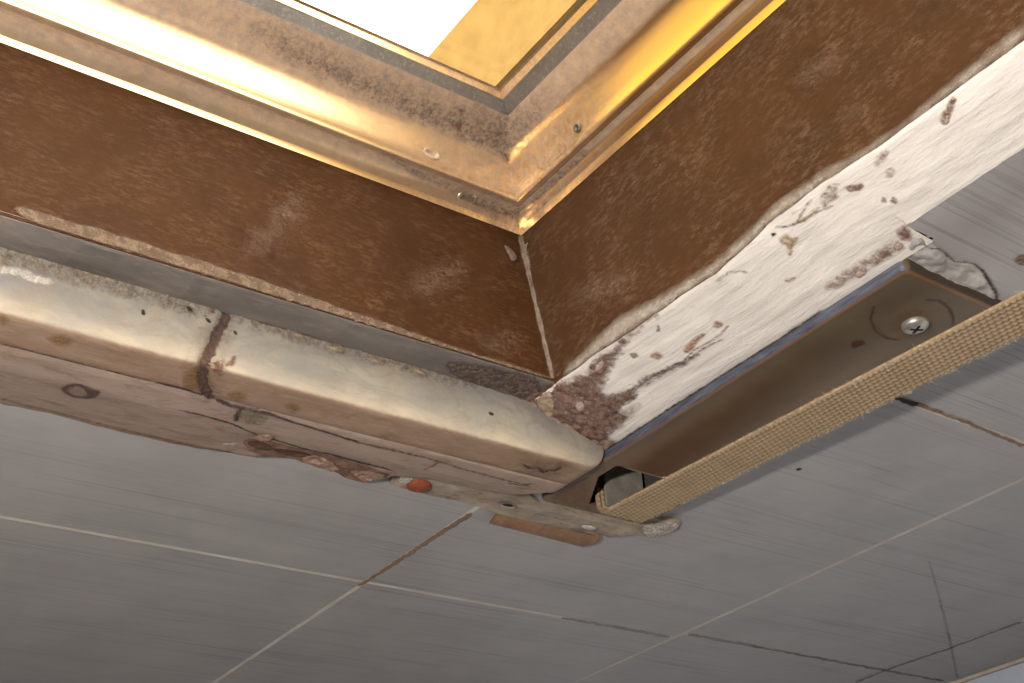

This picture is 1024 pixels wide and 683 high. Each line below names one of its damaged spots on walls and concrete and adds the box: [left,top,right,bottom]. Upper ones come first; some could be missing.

spalling [942,99,956,124]
flaking render [827,227,996,299]
crack [6,312,561,486]
spalling [224,434,389,482]